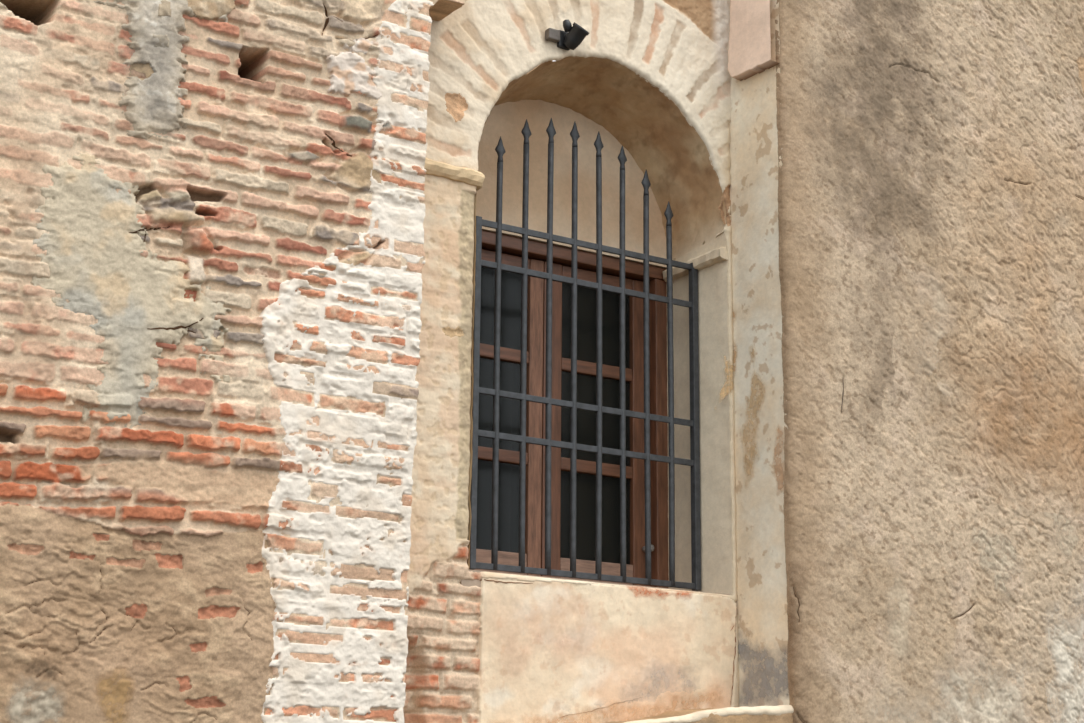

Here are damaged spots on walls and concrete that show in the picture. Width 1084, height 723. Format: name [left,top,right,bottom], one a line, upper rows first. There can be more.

spalling [158,0,172,17]
spalling [187,0,235,20]
spalling [129,63,154,80]
leakage [835,0,919,220]
peeling [246,0,483,723]